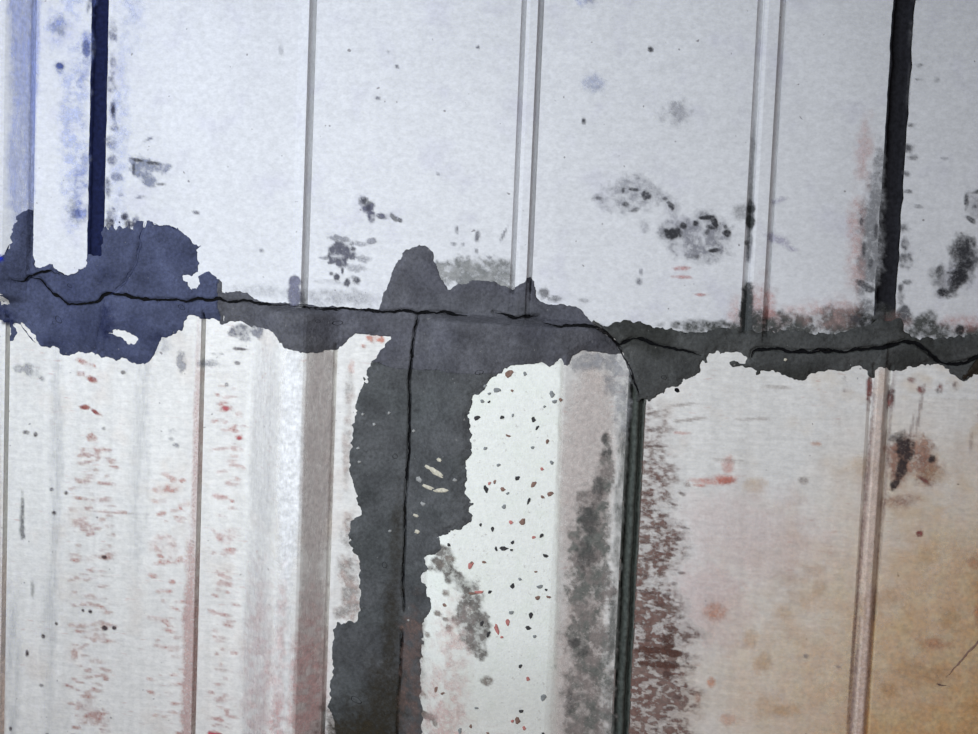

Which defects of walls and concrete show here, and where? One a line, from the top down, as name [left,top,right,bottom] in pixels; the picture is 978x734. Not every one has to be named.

damp [615,178,674,210]
damp [659,212,731,258]
damp [673,155,978,339]
crack [495,312,701,395]
crack [751,340,978,366]
crack [2,223,467,734]
damp [296,352,402,734]
damp [558,354,630,734]
corrosion [628,442,699,734]
damp [856,425,872,603]
corrosion [847,377,978,734]